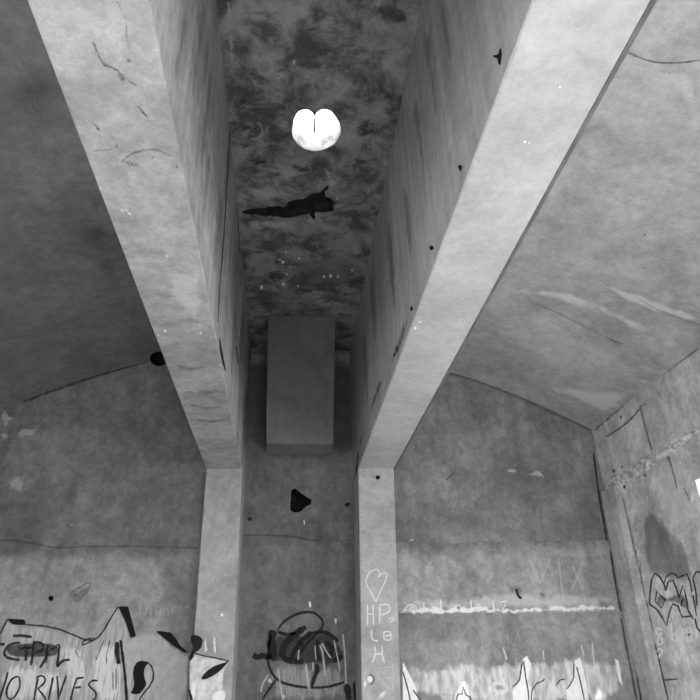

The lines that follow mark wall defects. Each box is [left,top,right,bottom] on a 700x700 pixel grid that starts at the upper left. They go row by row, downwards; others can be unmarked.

water stain [642,510,700,583]